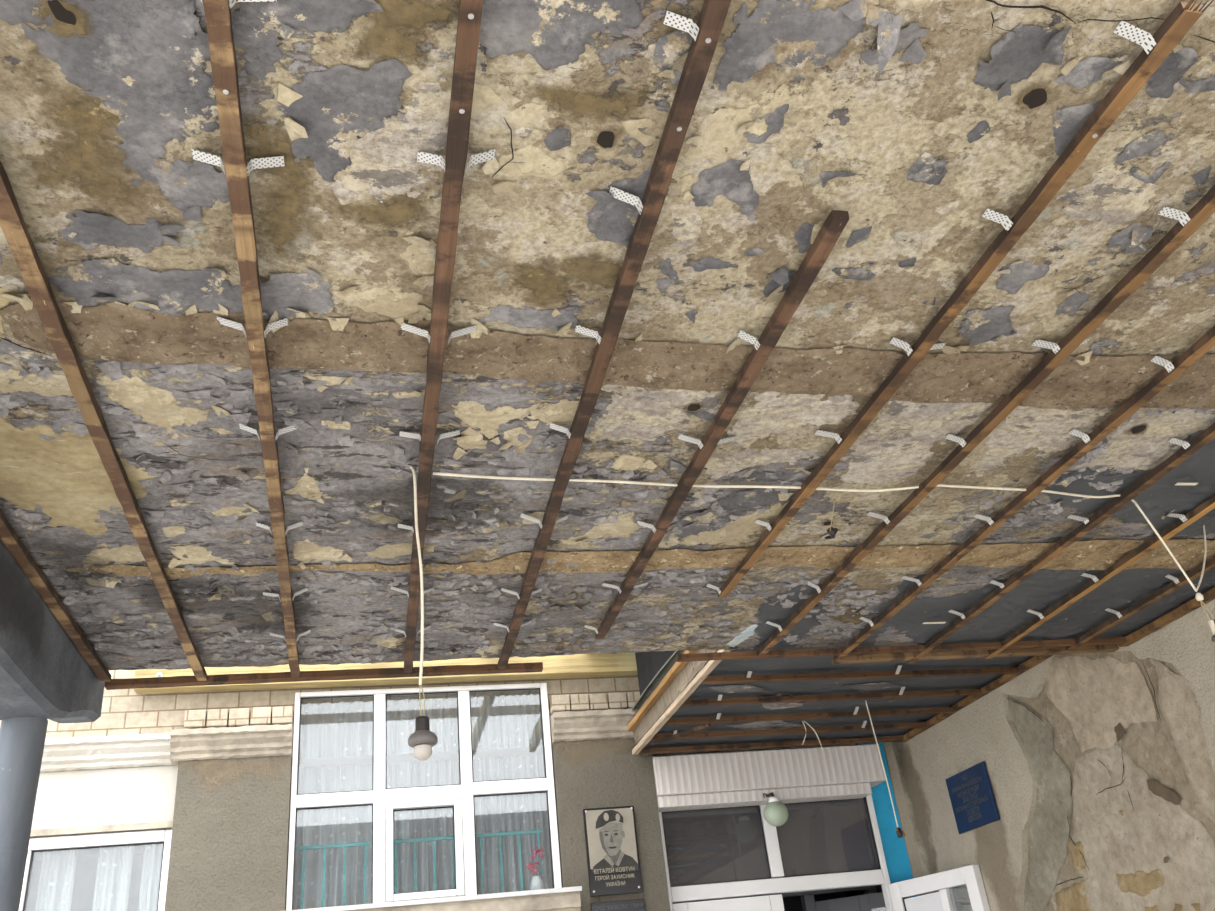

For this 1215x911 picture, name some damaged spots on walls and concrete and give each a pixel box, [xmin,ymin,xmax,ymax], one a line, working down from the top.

crack [986,0,1165,32]
damp [24,49,140,198]
damp [512,254,622,305]
spalling [0,0,1215,669]
peeling [709,684,803,730]
spalling [1007,651,1215,911]